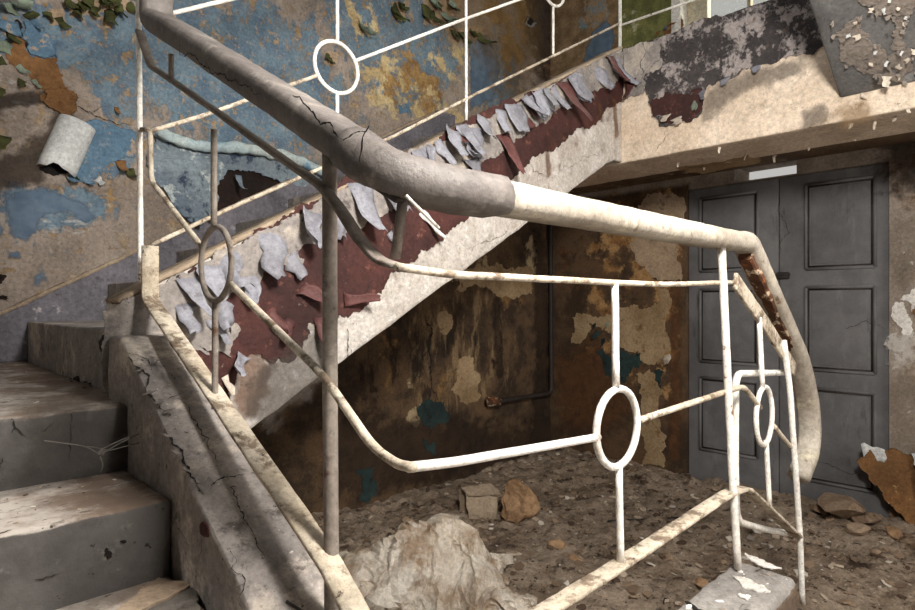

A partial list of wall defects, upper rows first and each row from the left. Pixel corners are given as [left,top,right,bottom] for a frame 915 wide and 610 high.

peeling [0,0,137,186]
peeling [406,0,915,180]
crack [129,353,265,556]
peeling [159,197,322,401]
peeling [337,175,469,318]
water stain [338,233,551,502]
peeling [455,262,534,299]
peeling [571,237,683,468]
peeling [638,191,687,219]
corrosion [738,253,793,351]
spalling [891,288,915,335]
peeling [715,553,783,610]